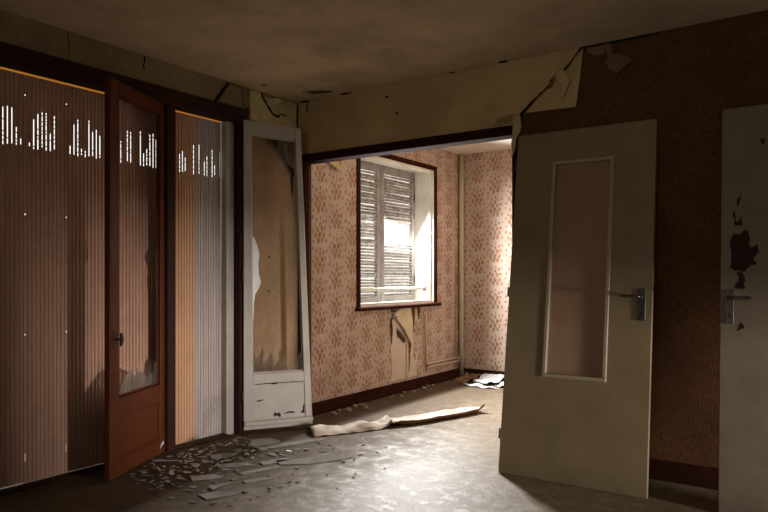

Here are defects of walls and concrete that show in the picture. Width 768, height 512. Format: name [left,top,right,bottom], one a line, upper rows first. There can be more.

crack [261,93,308,128]
flaking render [390,308,421,383]